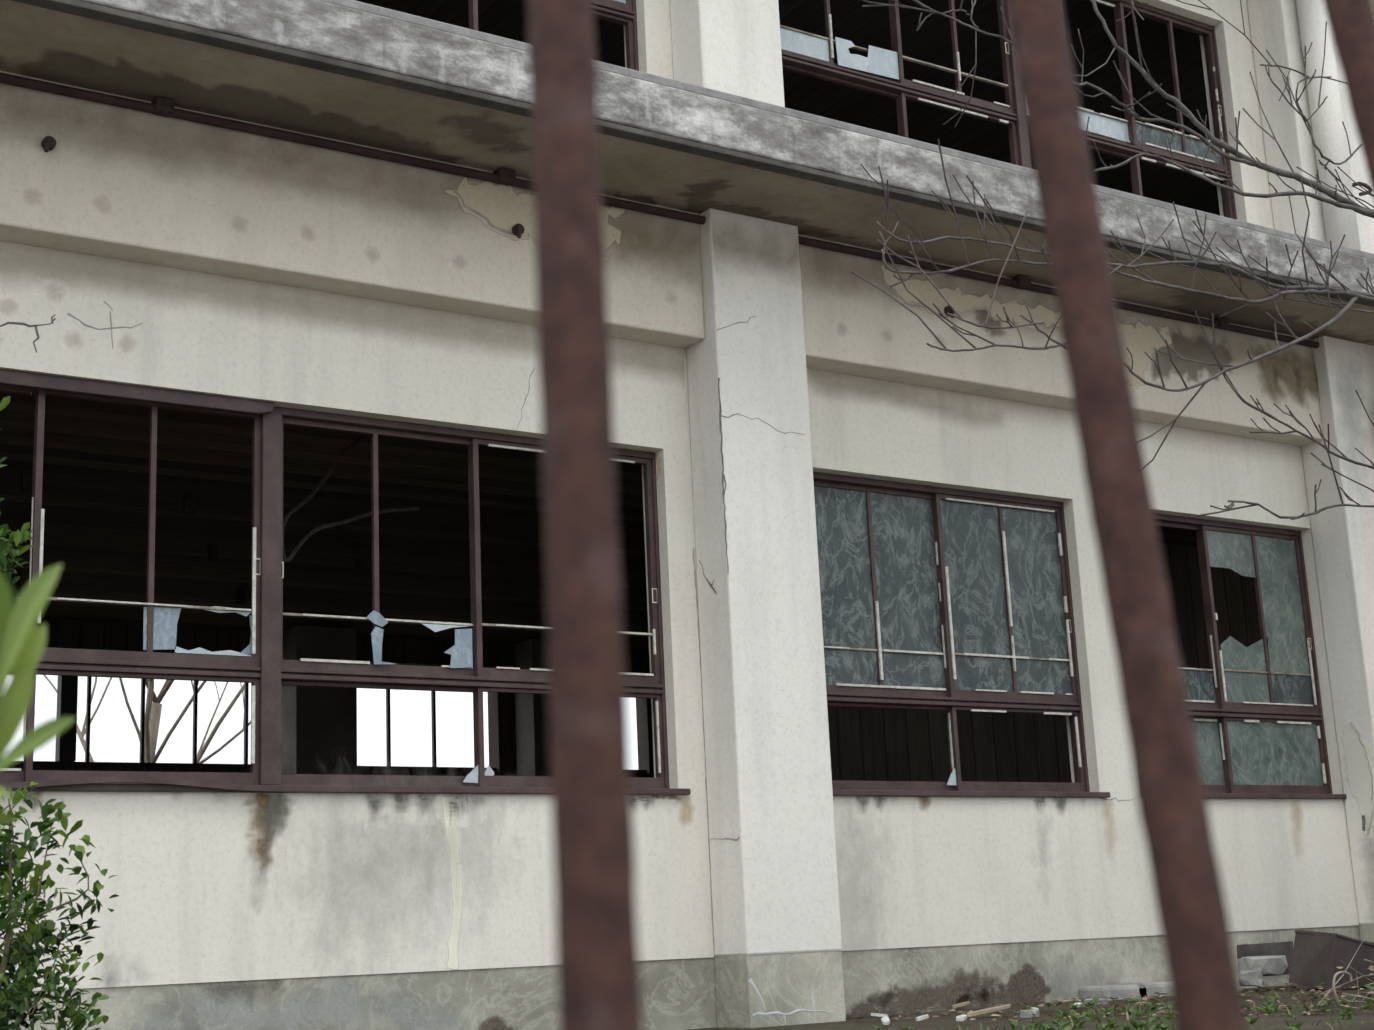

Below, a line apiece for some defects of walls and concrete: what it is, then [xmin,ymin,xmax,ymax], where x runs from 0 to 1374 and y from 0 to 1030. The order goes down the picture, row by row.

damp [24,53,457,164]
peeling [445,177,535,244]
peeling [603,206,625,262]
crack [0,301,142,353]
peeling [881,265,1060,330]
damp [1176,293,1351,341]
damp [1154,335,1230,379]
damp [1259,356,1319,402]
crack [693,378,805,945]